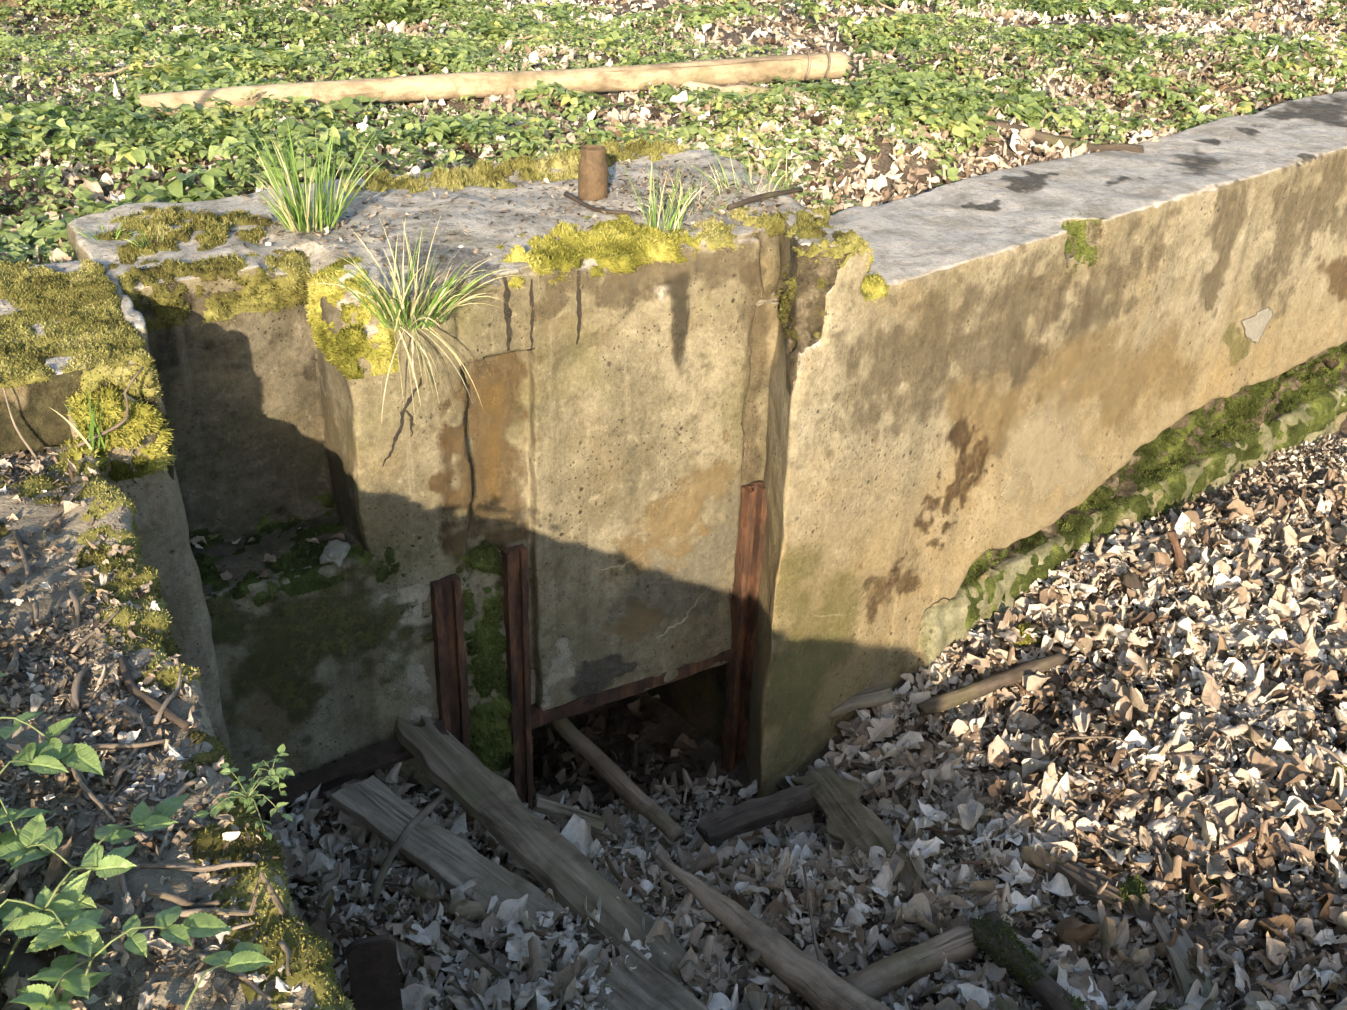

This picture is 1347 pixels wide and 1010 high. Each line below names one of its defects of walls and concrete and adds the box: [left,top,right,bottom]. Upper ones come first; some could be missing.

water stain [533,233,767,393]
spalling [777,235,860,396]
corrosion [430,352,530,558]